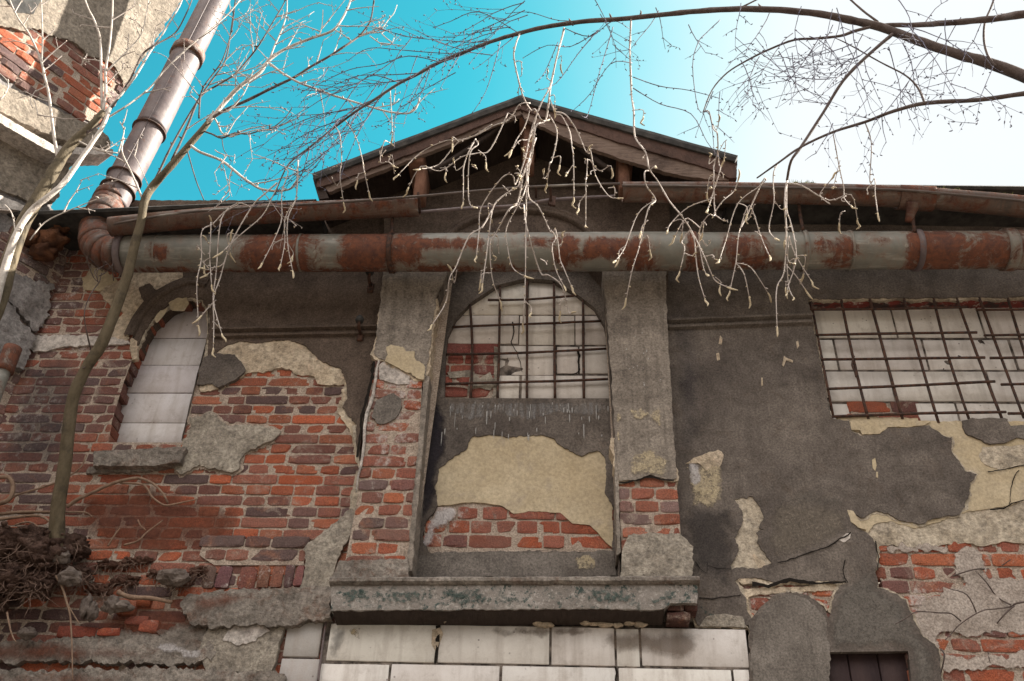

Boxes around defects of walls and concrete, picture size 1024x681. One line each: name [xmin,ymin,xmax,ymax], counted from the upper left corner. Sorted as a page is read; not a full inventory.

peeling [197,340,425,493]
spalling [56,600,198,657]
peeling [223,624,270,646]
spalling [417,435,616,577]
crack [778,532,851,583]
spalling [774,416,1024,681]